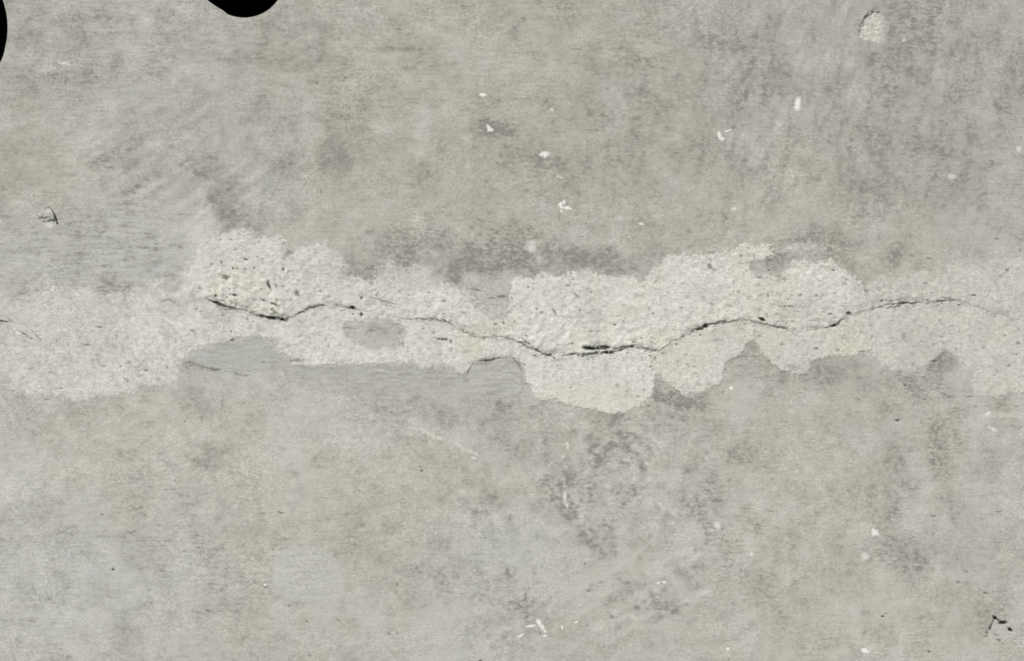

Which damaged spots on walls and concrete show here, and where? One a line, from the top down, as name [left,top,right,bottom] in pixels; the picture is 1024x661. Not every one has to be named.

spalling [0,233,1024,416]
crack [204,291,1024,382]